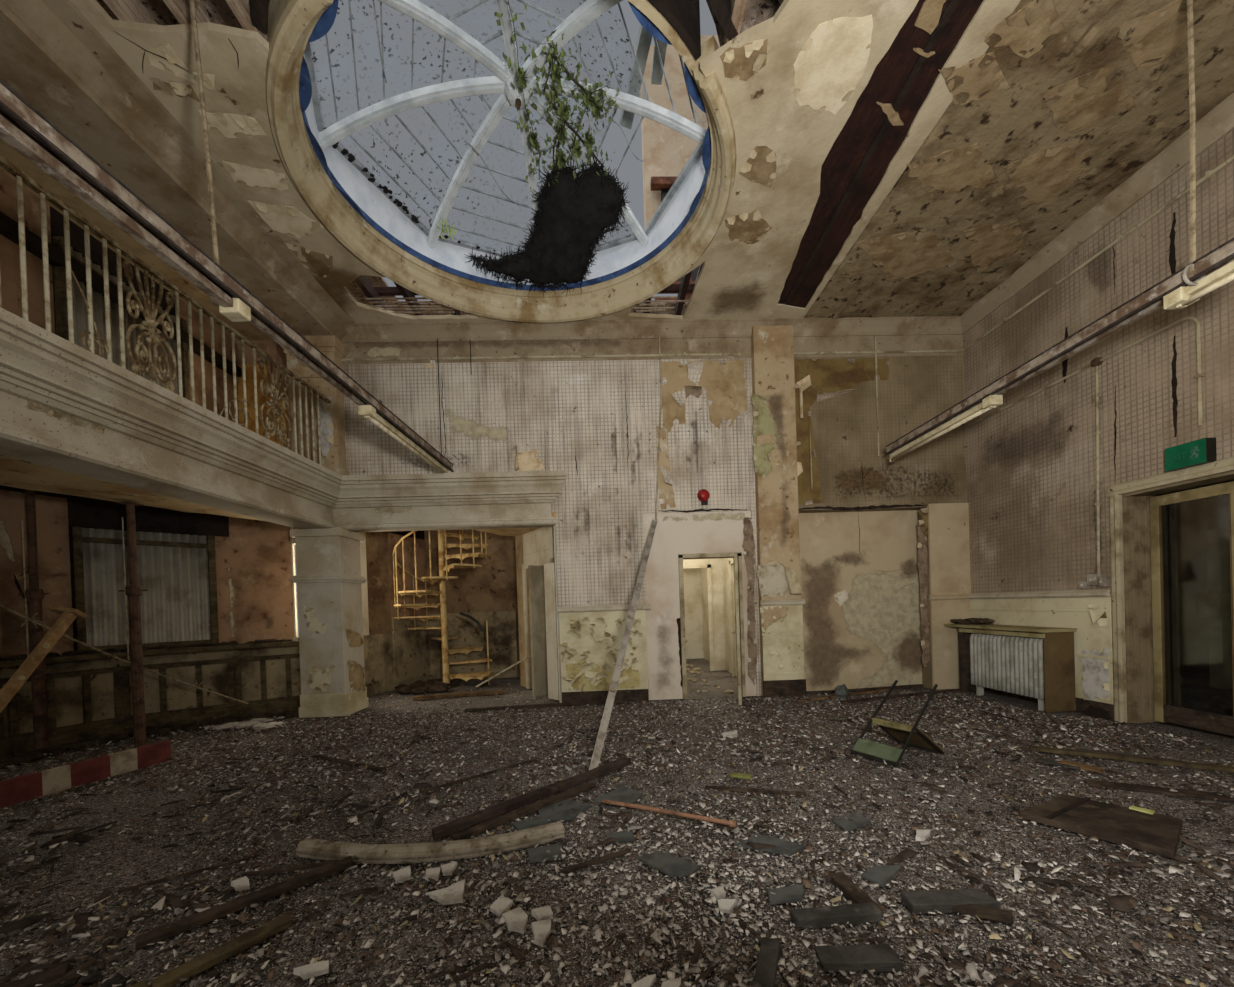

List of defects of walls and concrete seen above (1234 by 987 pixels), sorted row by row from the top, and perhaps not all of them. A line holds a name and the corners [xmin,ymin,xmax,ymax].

peeling [720,38,768,82]
peeling [794,15,873,115]
peeling [739,146,777,188]
peeling [725,210,772,244]
spalling [726,394,801,479]
peeling [556,616,643,692]
damp [806,554,861,686]
damp [897,635,922,670]